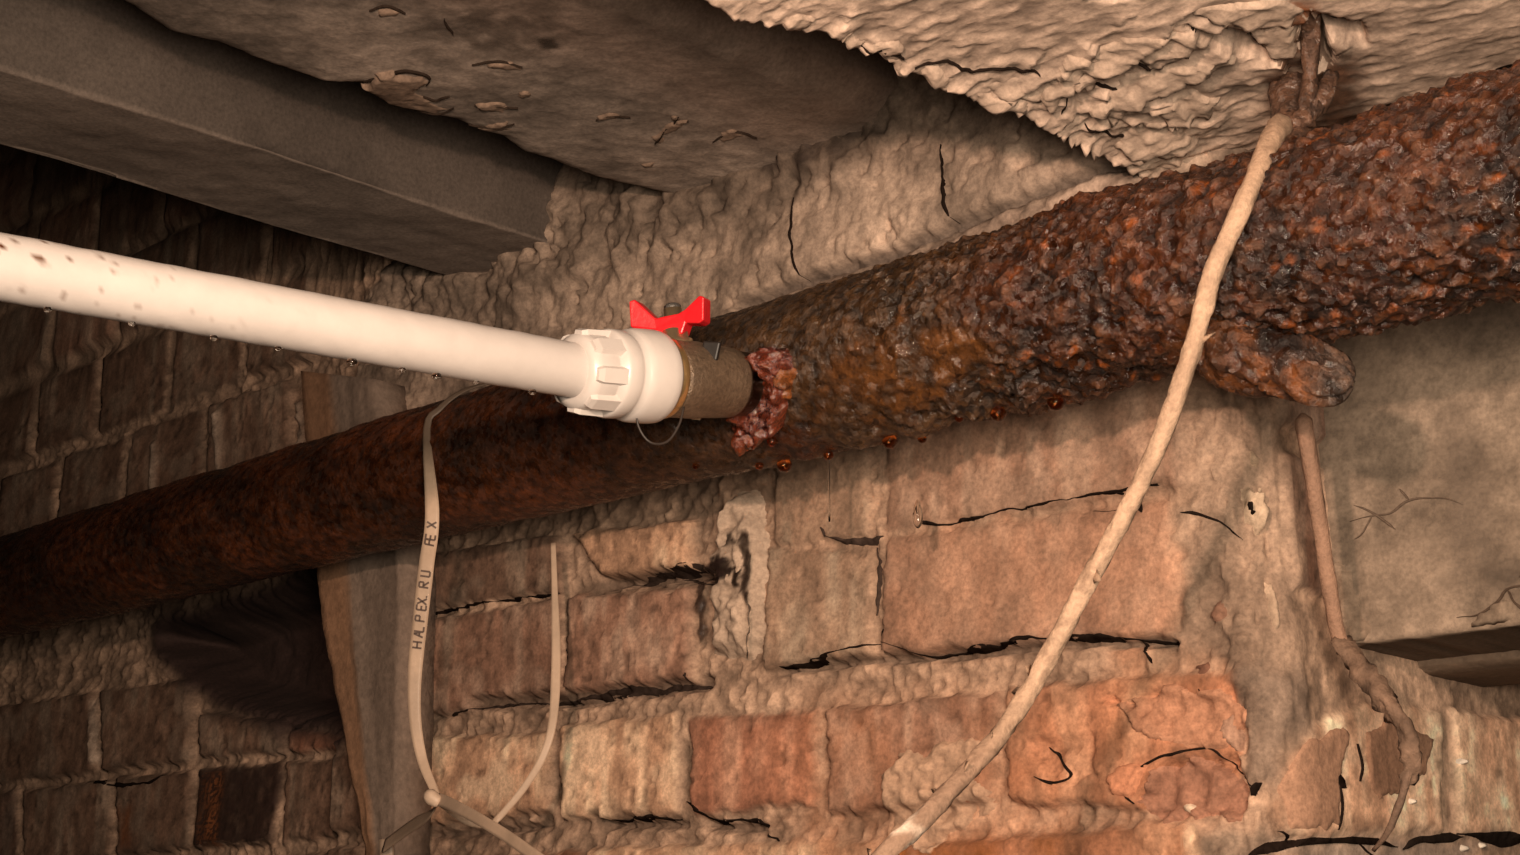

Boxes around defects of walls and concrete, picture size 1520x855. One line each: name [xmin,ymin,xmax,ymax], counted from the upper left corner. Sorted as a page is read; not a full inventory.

peeling [784,14,815,30]
peeling [842,30,950,92]
spalling [976,0,1314,179]
corrosion [1266,3,1361,129]
corrosion [726,347,798,456]
corrosion [817,327,988,425]
crack [922,483,1243,540]
crack [632,562,715,587]
crack [779,527,1180,670]
crack [1125,747,1262,804]
spalling [1277,721,1434,831]
crack [1248,744,1520,855]